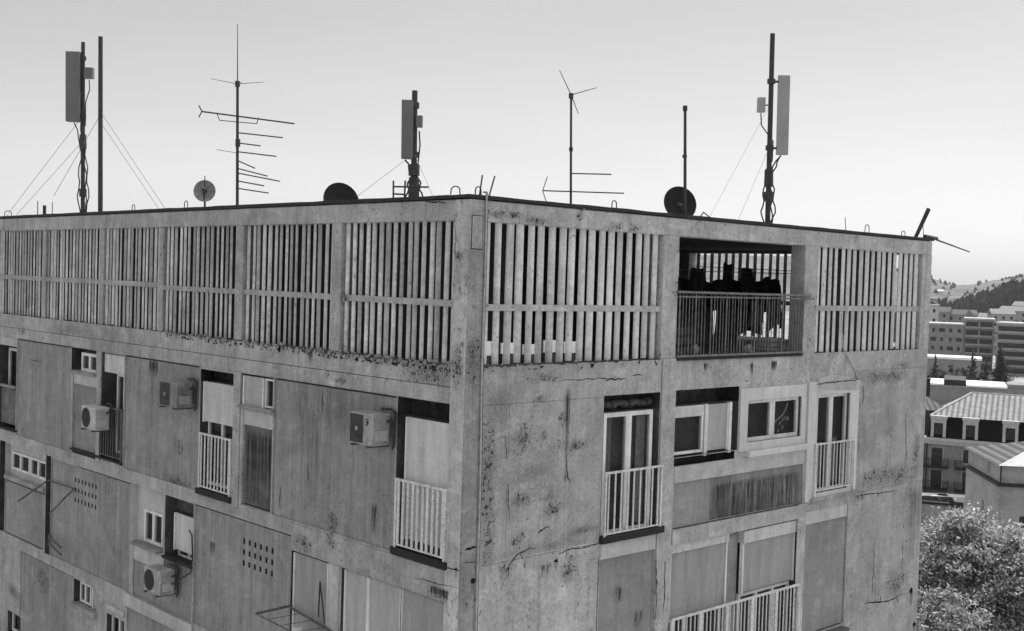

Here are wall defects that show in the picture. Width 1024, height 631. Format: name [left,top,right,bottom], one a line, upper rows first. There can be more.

crack [561,373,643,381]
crack [506,527,596,578]